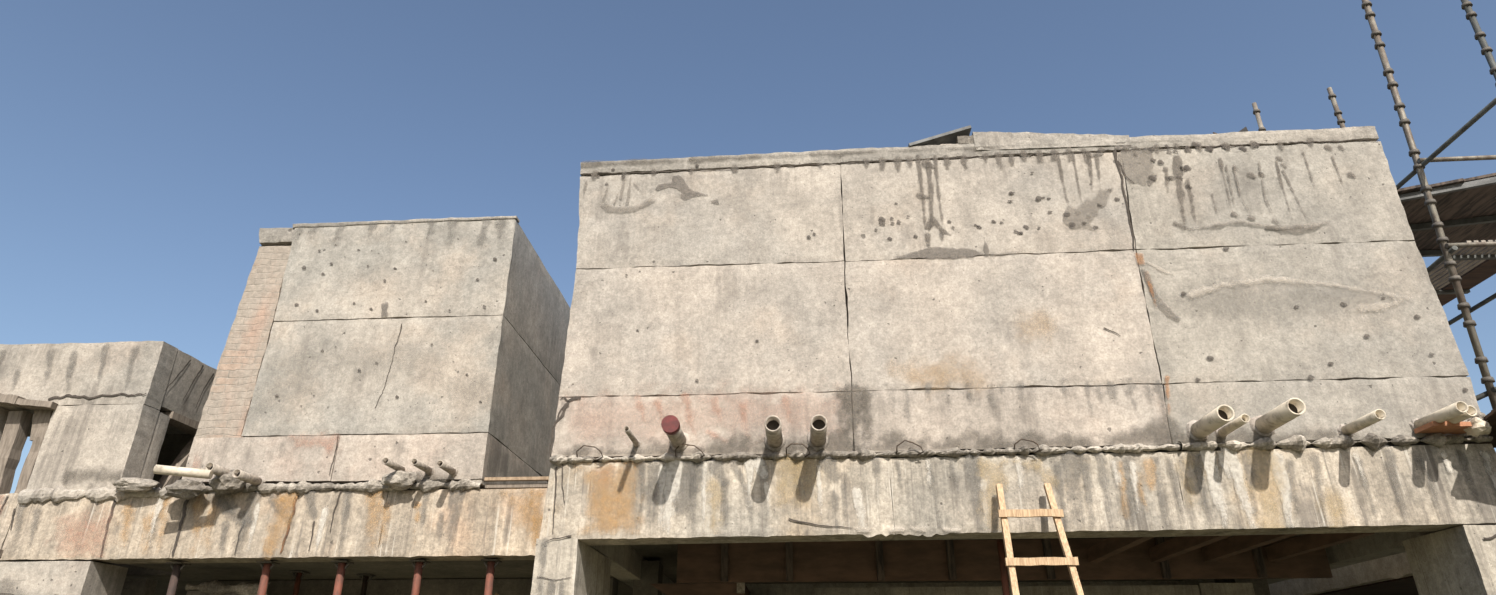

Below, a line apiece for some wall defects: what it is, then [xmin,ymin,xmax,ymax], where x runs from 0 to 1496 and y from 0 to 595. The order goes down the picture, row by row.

damp [581,159,657,179]
damp [689,154,791,172]
damp [810,137,1299,245]
damp [1302,138,1356,181]
crack [48,360,214,407]
crack [376,324,402,406]
damp [607,438,769,530]
damp [780,385,1303,528]